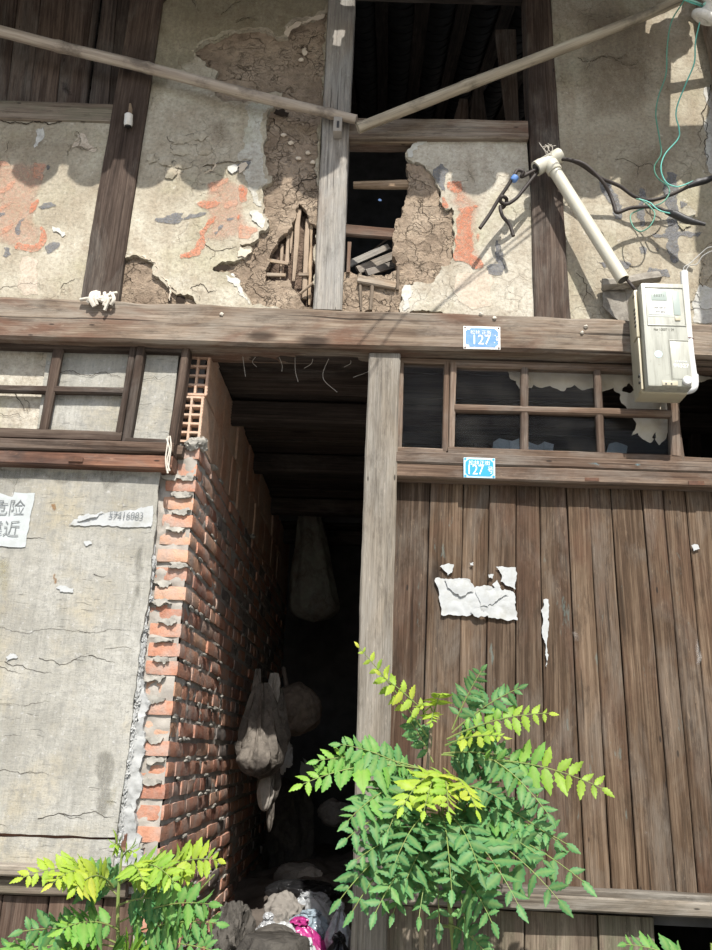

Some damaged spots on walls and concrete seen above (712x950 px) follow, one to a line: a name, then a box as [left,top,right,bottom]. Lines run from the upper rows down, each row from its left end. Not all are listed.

crack [158,134,252,174]
flaking render [195,14,327,309]
peeling [704,87,712,174]
flaking render [342,142,455,312]
flaking render [121,258,196,304]
peeling [692,261,712,324]
crack [0,628,131,674]
spalling [115,544,157,863]